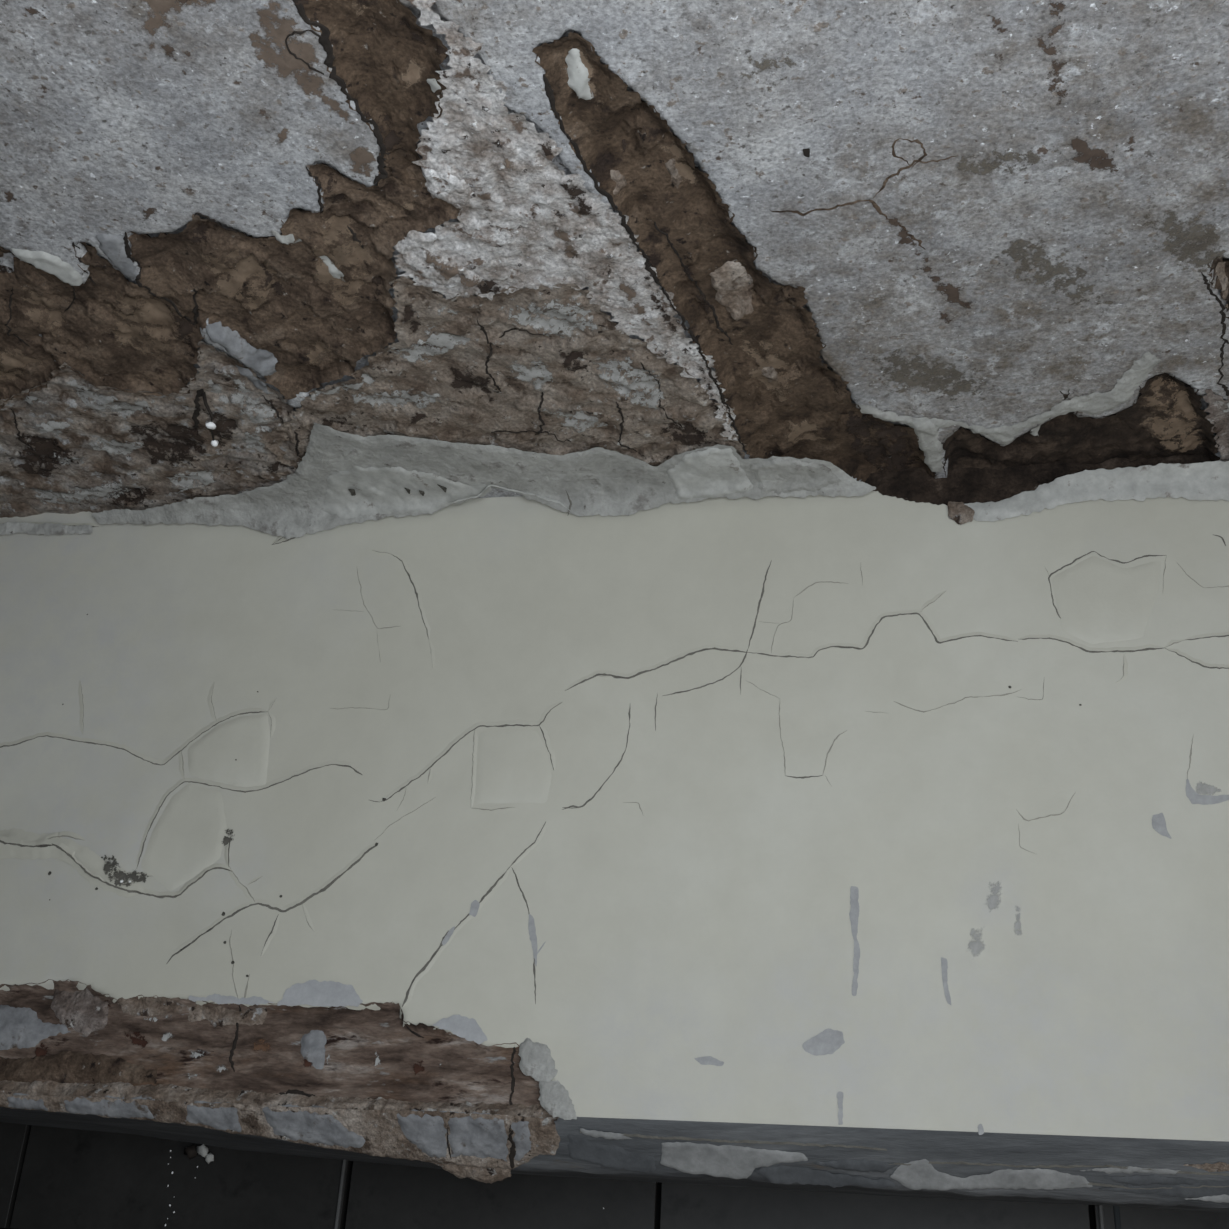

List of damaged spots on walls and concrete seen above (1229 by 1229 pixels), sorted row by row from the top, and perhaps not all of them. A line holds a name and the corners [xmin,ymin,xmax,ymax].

spalling [0,0,1229,539]
crack [771,138,958,250]
crack [0,550,1229,1007]
spalling [0,979,632,1184]
peeling [660,1142,1229,1203]